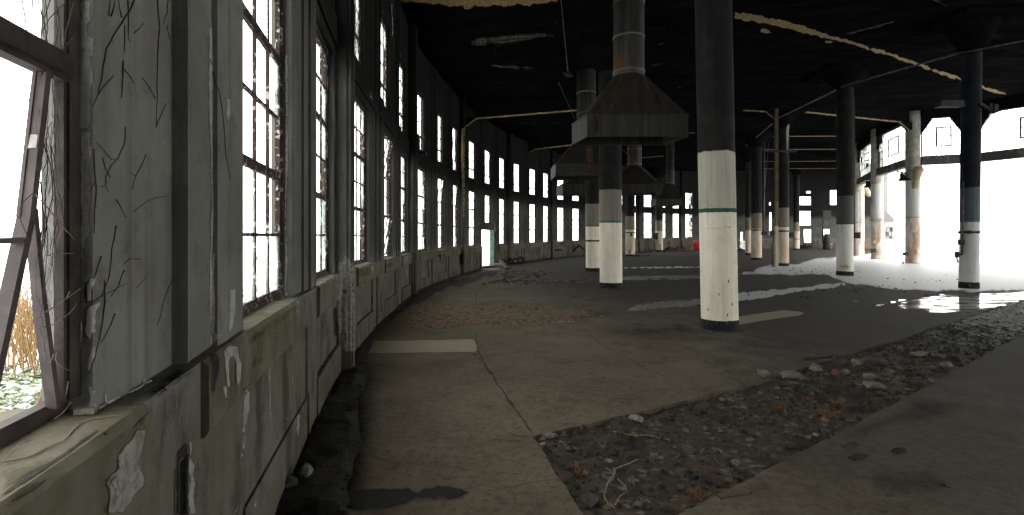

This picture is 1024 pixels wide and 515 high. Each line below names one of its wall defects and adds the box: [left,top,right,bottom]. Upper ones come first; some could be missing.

peeling [81,1,94,258]
peeling [208,26,236,346]
peeling [81,278,101,370]
crack [475,335,533,433]
flaking render [107,429,146,513]